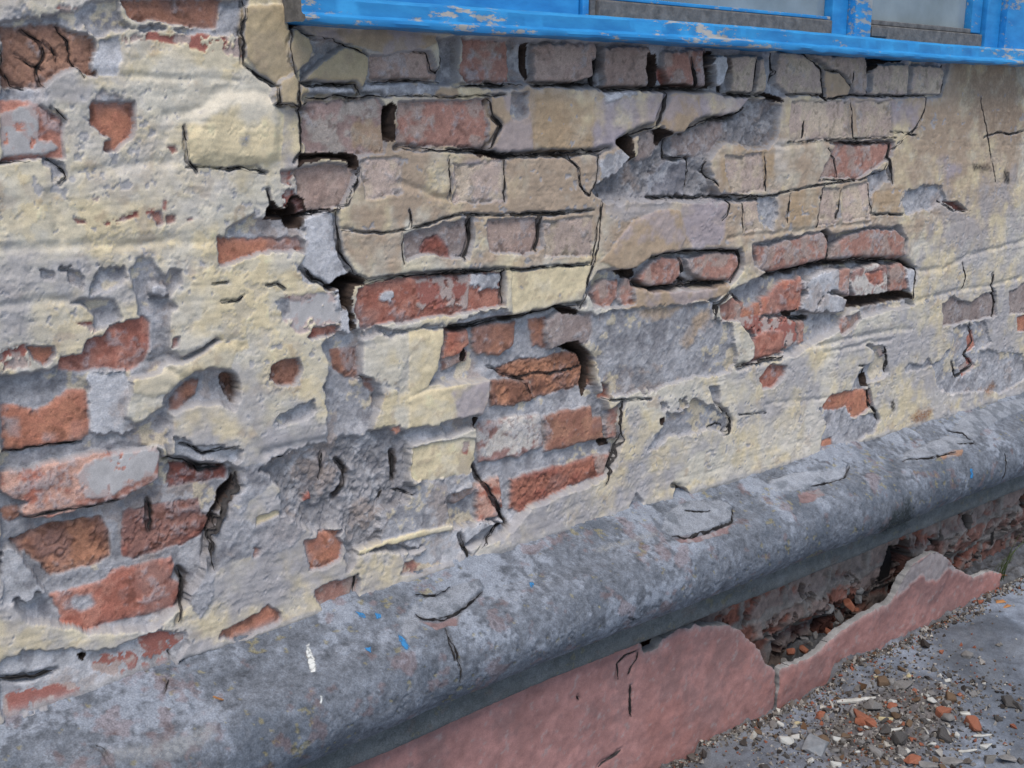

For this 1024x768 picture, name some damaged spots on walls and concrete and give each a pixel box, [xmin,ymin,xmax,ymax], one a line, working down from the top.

crack [980,97,1023,182]
flaking render [901,184,967,215]
spalling [0,0,949,630]
crack [482,519,504,548]
crack [672,508,733,540]
flaking render [219,604,281,638]
crack [415,587,482,679]
flaking render [0,629,189,718]
crack [616,651,638,716]